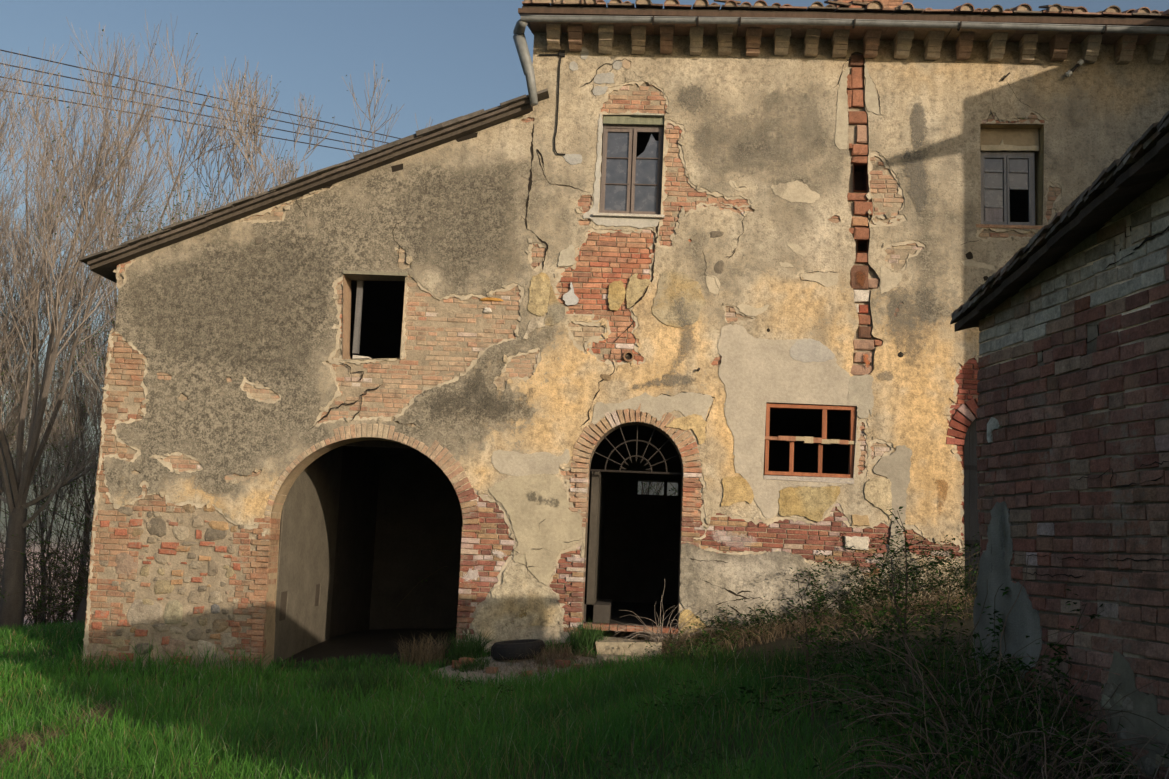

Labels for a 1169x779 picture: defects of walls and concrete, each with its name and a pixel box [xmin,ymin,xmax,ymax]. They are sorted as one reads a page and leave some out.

crack [521,124,586,267]
flaking render [525,80,757,368]
flaking render [866,151,907,227]
leakage [903,103,930,215]
flaking render [227,373,282,404]
crack [308,362,382,431]
flaking render [314,247,542,428]
flaking render [82,328,270,672]
flaking render [452,481,520,635]
flaking render [560,174,1169,779]